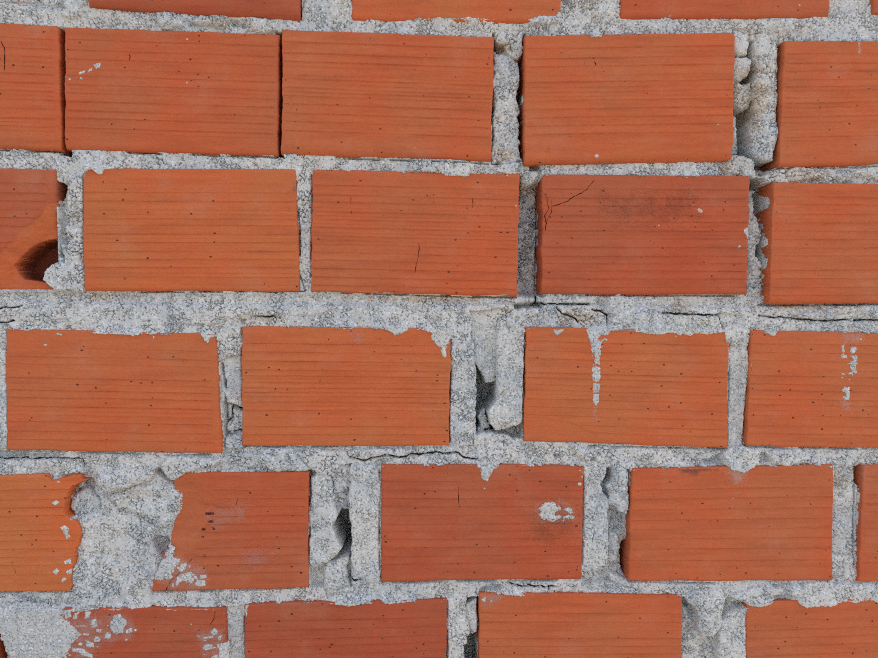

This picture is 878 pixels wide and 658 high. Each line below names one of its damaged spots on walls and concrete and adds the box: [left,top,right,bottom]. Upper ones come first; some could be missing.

crack [544,179,595,231]
spalling [0,202,59,289]
crack [533,295,608,322]
crack [663,312,721,324]
crack [759,314,878,322]
peeling [172,563,207,587]